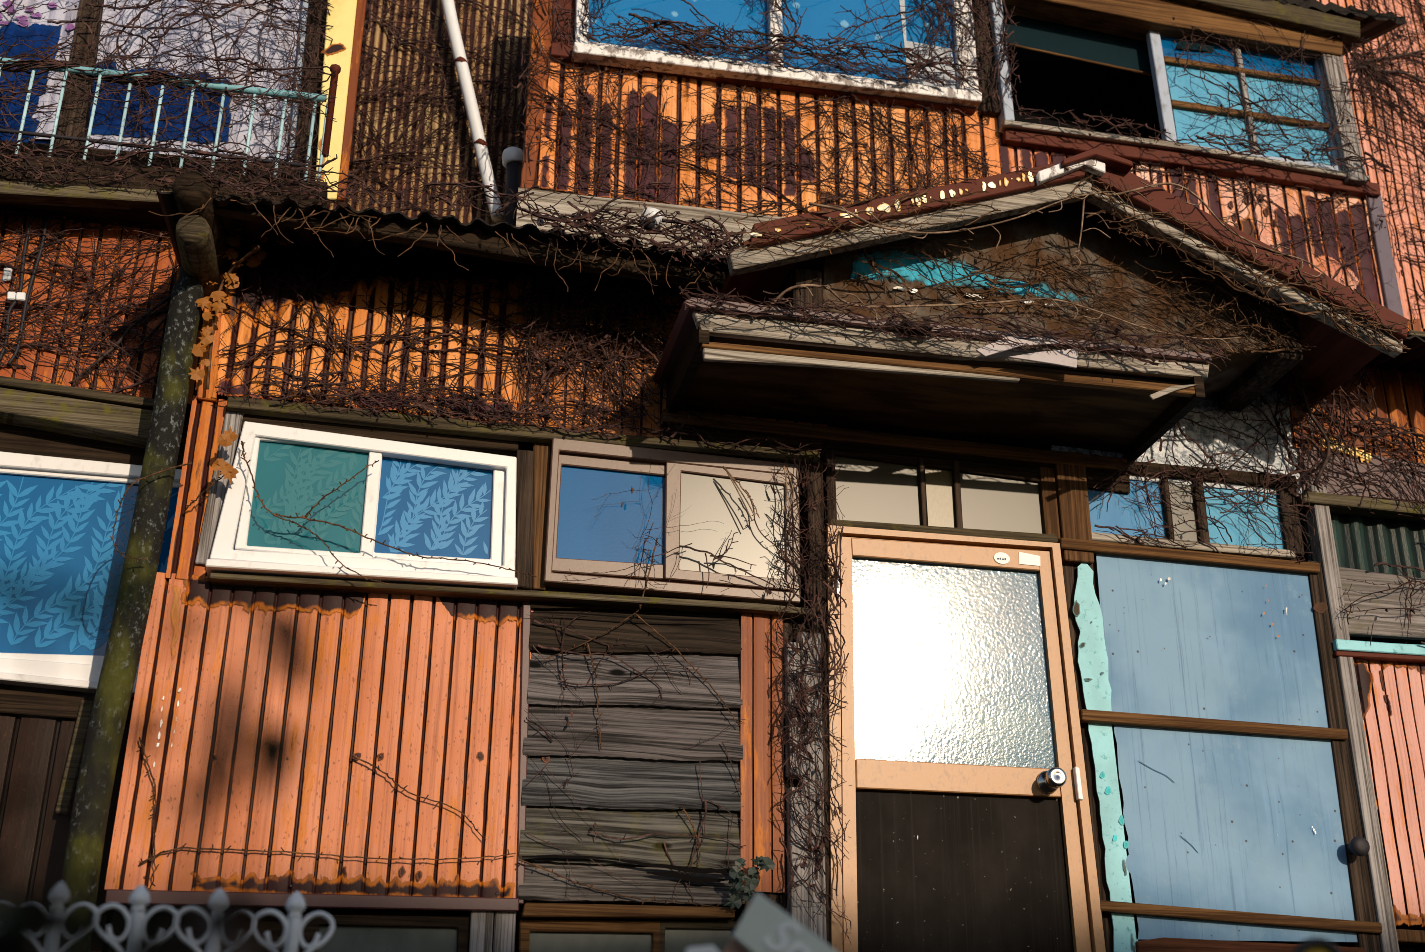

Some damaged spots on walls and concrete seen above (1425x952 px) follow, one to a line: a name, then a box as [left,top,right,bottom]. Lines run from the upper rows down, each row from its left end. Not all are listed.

peeling [828,171,1034,220]
rust [169,574,366,677]
rust [439,597,522,626]
rust [191,866,515,898]
rust [1393,905,1425,927]